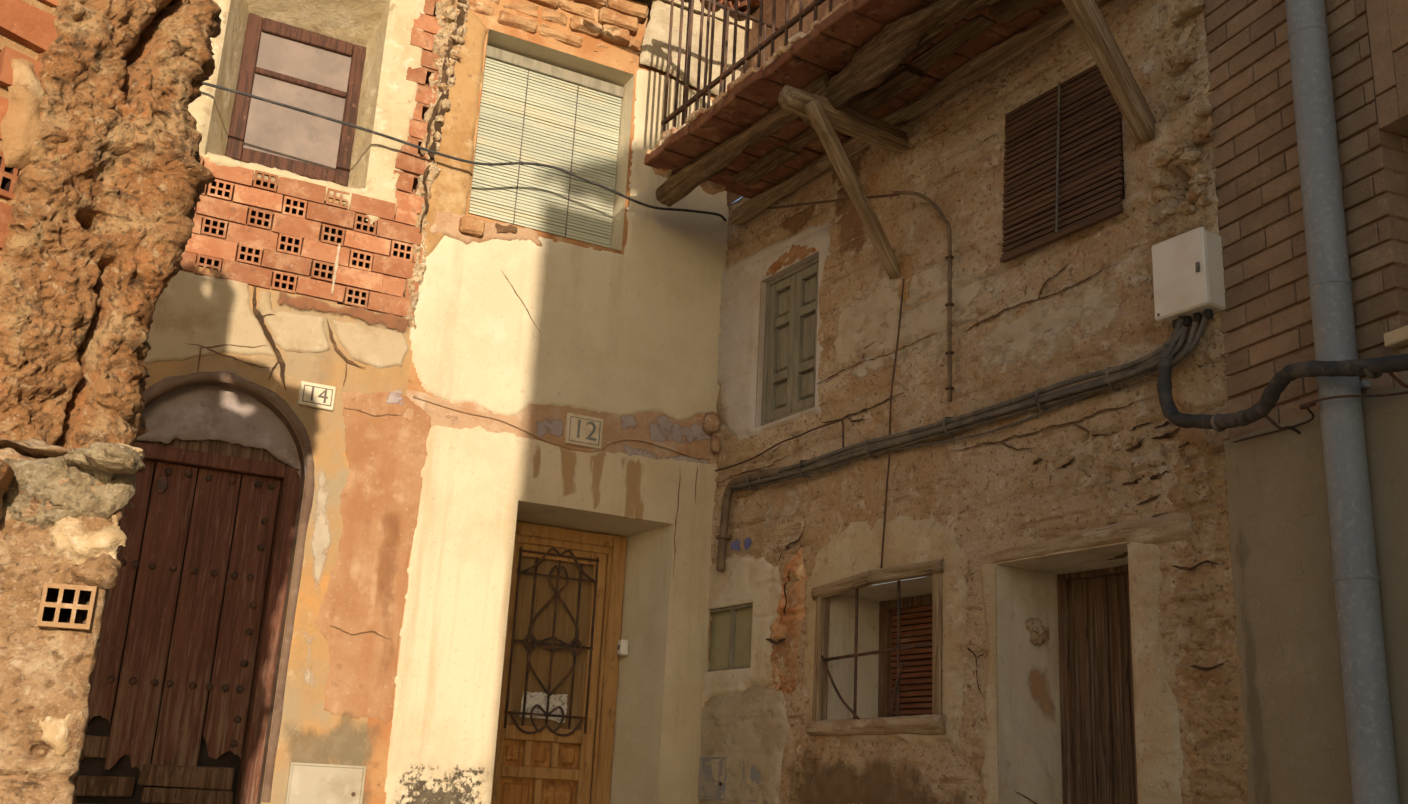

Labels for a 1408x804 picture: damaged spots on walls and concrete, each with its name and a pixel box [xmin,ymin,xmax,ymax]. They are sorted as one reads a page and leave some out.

spalling [763,244,816,278]
crack [501,270,540,332]
crack [184,285,286,390]
crack [327,319,365,385]
spalling [315,390,721,724]